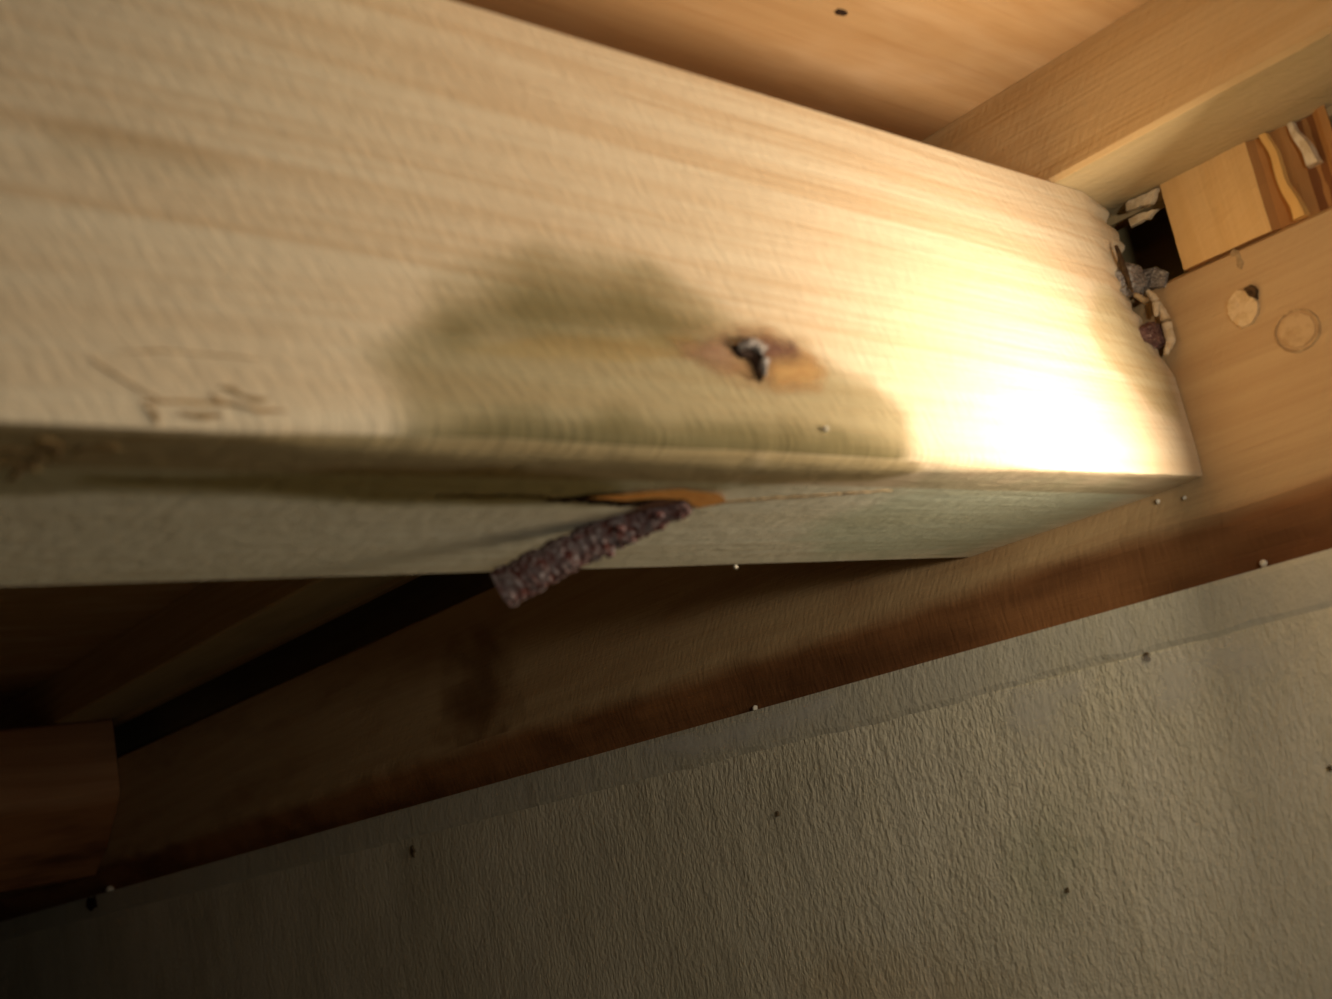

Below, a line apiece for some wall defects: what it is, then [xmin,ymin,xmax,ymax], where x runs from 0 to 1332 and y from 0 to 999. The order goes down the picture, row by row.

spalling [1126,188,1160,228]
spalling [1114,245,1176,356]
corrosion [697,333,819,384]
crack [439,493,666,507]
crack [725,490,893,503]